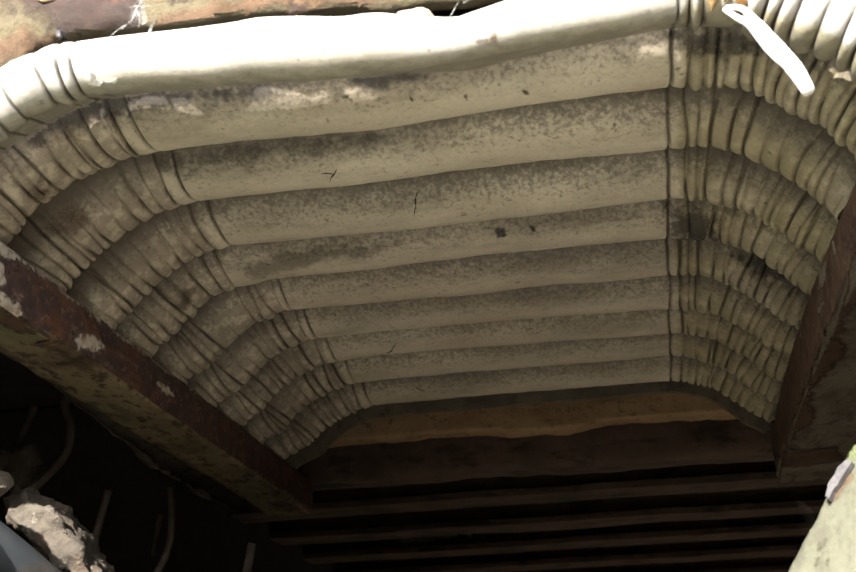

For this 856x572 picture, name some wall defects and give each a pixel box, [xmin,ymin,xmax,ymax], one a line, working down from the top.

damp [671,30,763,60]
damp [352,73,427,88]
damp [664,201,723,245]
damp [732,256,786,281]
rust [773,183,856,467]
rust [0,255,313,515]